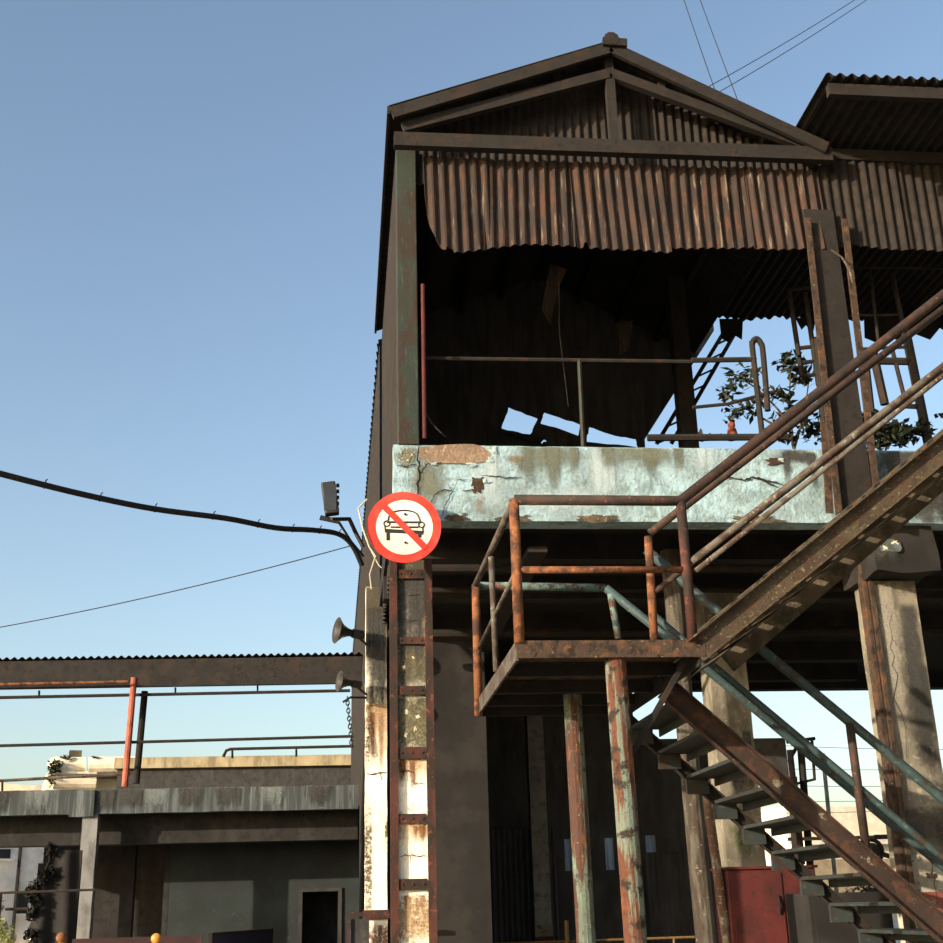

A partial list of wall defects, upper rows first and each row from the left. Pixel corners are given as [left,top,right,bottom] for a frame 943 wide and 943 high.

flaking render [397,444,497,493]
crack [397,447,523,513]
water stain [476,449,501,504]
water stain [509,447,578,482]
water stain [537,447,683,511]
crack [728,476,780,487]
rust [398,757,427,783]
rust [398,823,427,839]
rust [399,895,429,936]